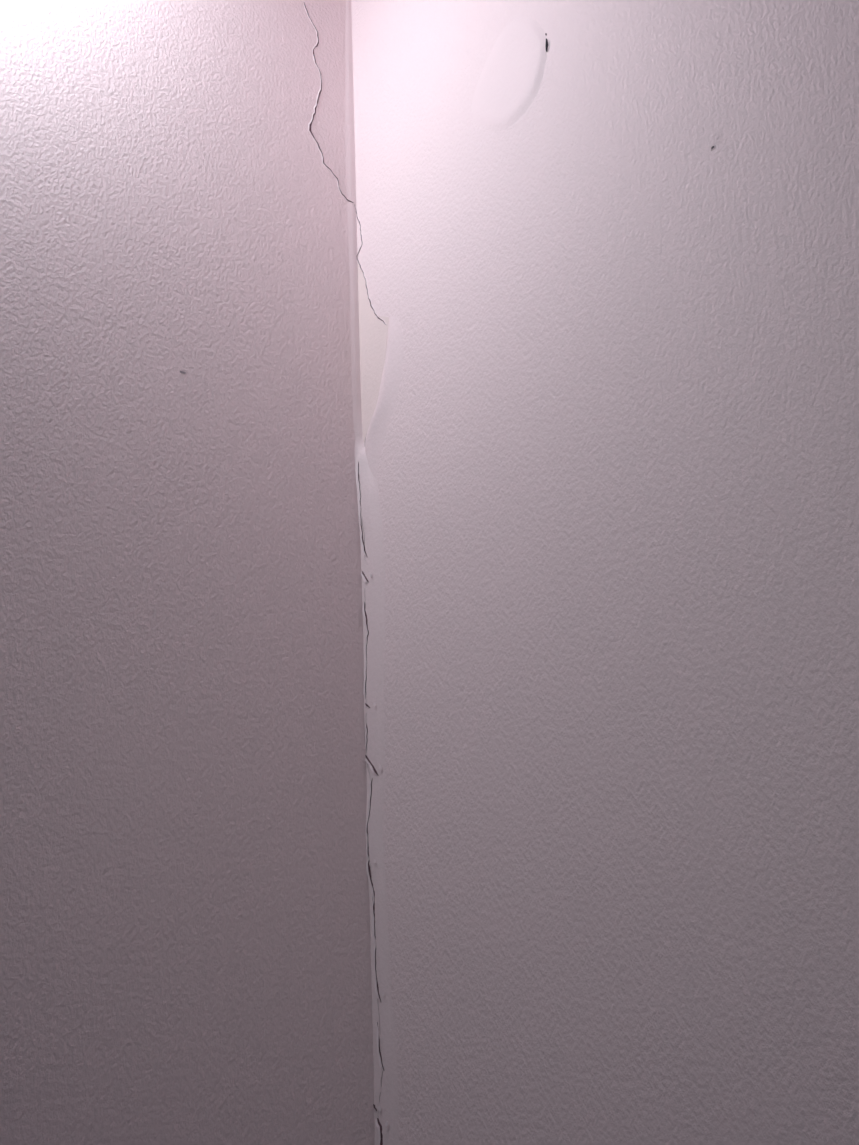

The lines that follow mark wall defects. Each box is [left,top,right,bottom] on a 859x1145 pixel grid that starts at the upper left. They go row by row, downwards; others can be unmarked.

crack [303,2,386,325]
crack [356,462,388,1145]